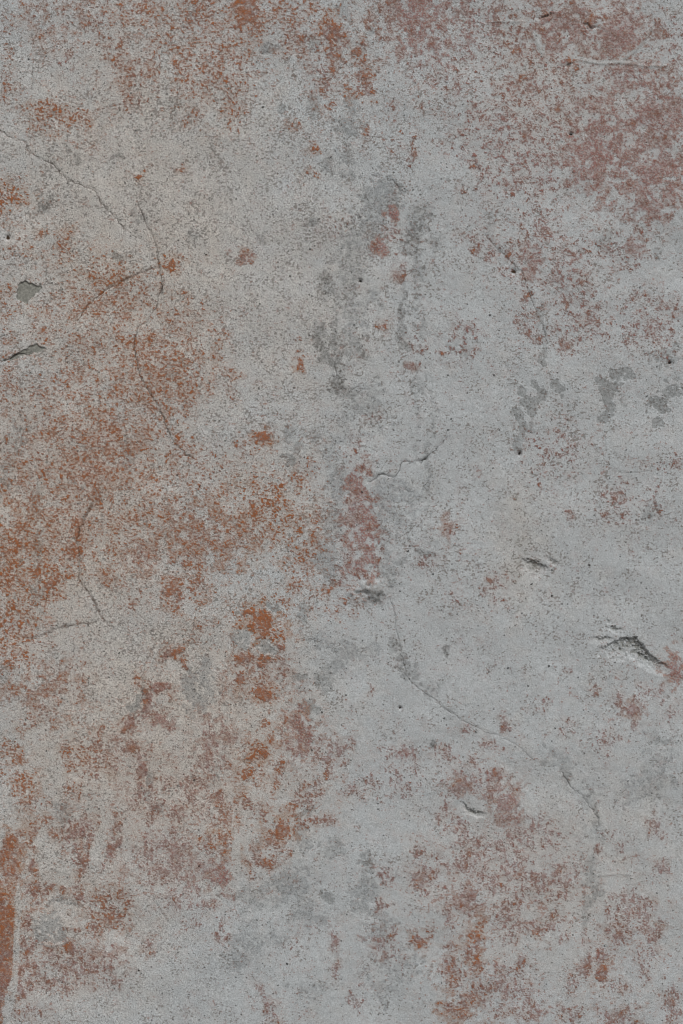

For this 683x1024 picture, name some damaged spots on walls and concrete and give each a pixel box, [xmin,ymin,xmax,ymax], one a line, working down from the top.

corrosion [1,0,269,137]
spalling [17,281,42,304]
spalling [4,344,45,361]
corrosion [0,175,361,1024]
corrosion [410,929,433,949]
corrosion [433,920,492,1024]
corrosion [568,934,610,996]